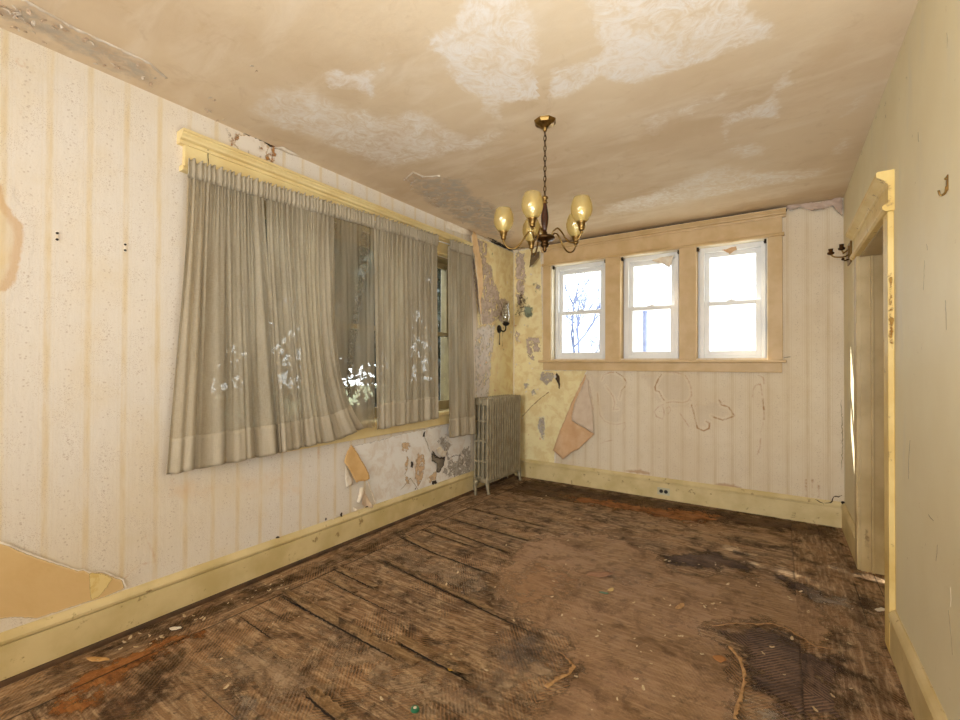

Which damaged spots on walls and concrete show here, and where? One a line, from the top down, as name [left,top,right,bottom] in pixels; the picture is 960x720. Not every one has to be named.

peeling [0,0,181,95]
water stain [0,176,34,302]
peeling [229,0,788,398]
peeling [340,445,373,517]
flaking render [431,434,471,485]
peeling [553,374,594,459]